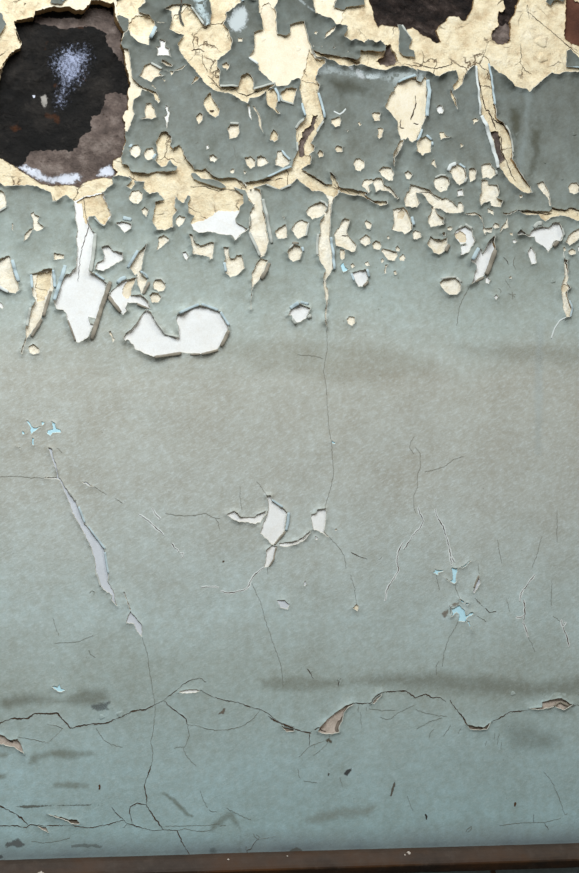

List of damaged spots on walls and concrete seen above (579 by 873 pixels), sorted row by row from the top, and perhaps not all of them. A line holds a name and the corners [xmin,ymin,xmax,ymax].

water stain [54,48,91,102]
water stain [18,164,80,184]
water stain [97,166,114,177]
spalling [0,0,579,358]
peeling [227,495,338,567]
peeling [432,561,471,584]
crack [0,638,330,855]
crack [353,689,468,737]
crack [485,710,527,746]